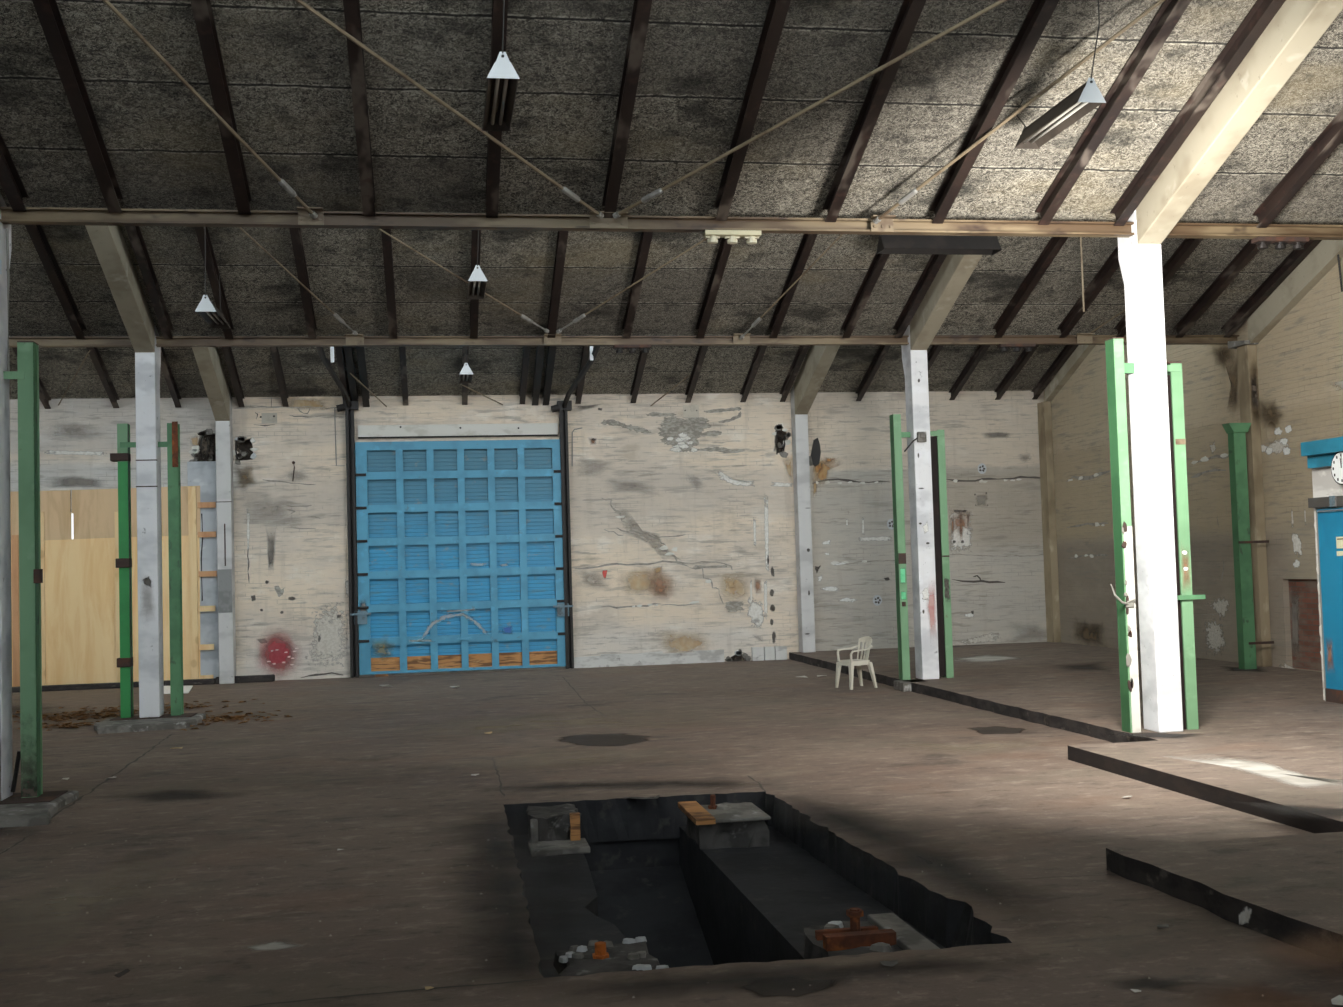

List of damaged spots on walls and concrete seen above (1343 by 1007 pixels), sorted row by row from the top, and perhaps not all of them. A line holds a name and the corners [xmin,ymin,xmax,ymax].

peeling [601,407,745,453]